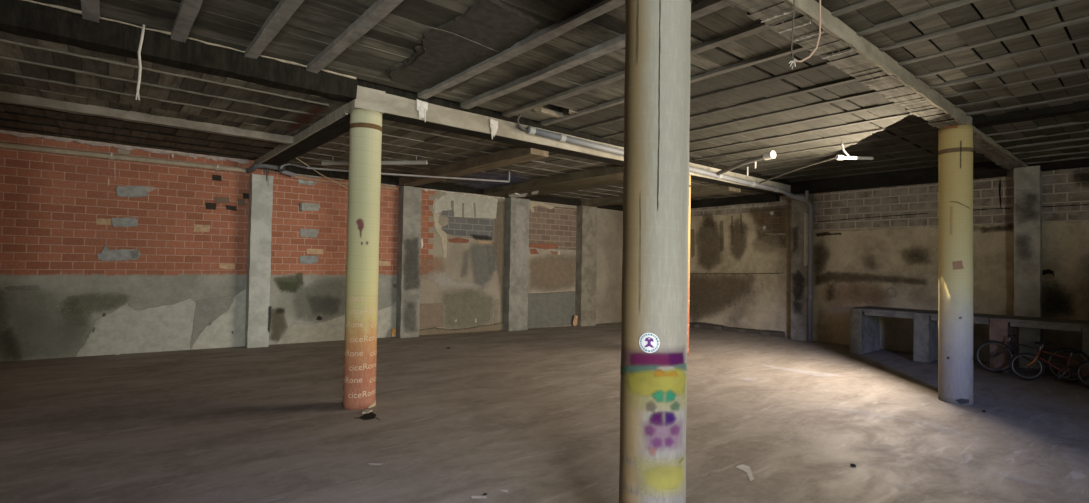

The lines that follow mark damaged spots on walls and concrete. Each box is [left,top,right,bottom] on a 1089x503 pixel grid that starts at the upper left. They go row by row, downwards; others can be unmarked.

peeling [432,193,498,258]
damp [689,211,786,322]
damp [65,295,124,311]
peeling [75,289,246,357]